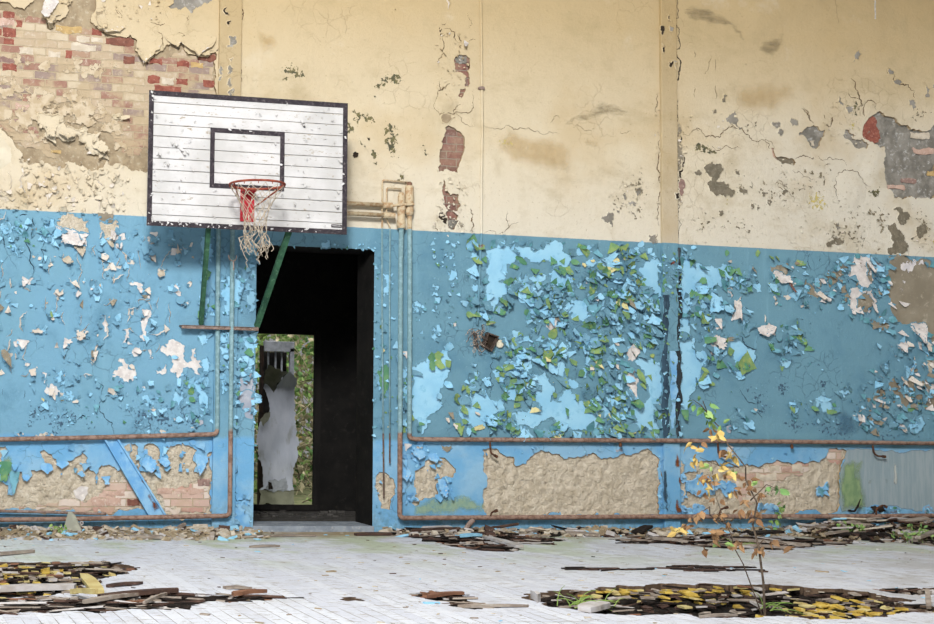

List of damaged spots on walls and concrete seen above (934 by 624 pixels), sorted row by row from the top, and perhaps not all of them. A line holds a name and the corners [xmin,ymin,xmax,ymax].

spalling [435,23,469,99]
crack [437,15,475,90]
spalling [659,14,677,70]
crack [655,0,775,240]
crack [776,155,844,192]
spalling [0,0,280,521]
peeling [288,82,934,525]
peeling [235,466,252,531]